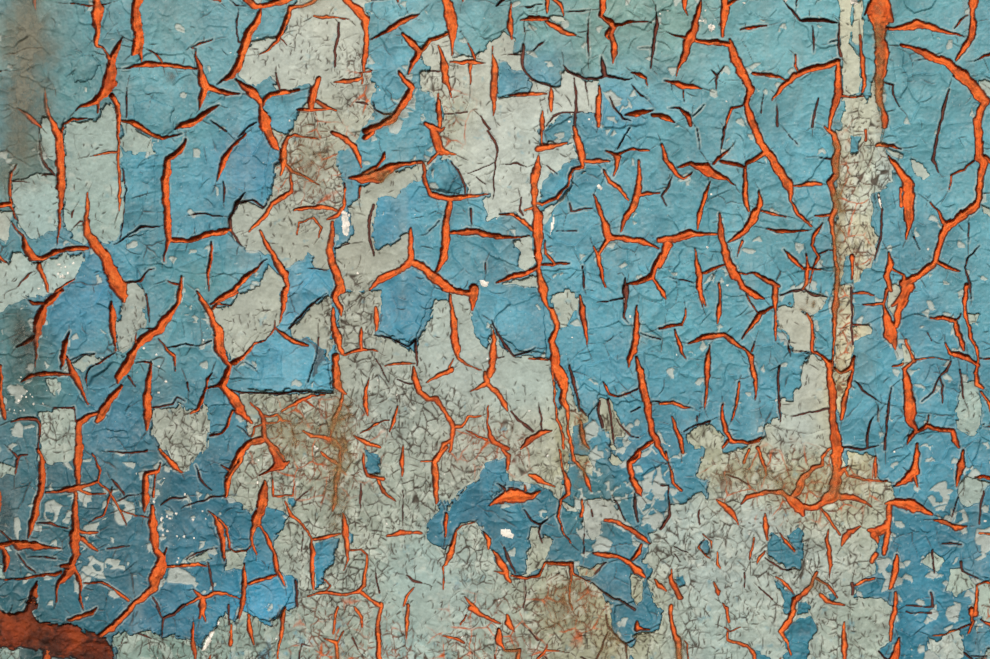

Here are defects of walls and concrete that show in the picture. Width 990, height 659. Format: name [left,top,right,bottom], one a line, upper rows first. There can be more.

peeling [0,104,158,312]
crack [0,0,384,659]
peeling [112,0,903,659]
crack [313,0,888,578]
crack [850,0,990,487]
peeling [37,408,76,465]
rust [0,595,114,659]
crack [483,531,636,611]
crack [749,537,845,656]
crack [867,496,967,564]
peeling [927,630,964,659]
peeling [923,552,990,622]